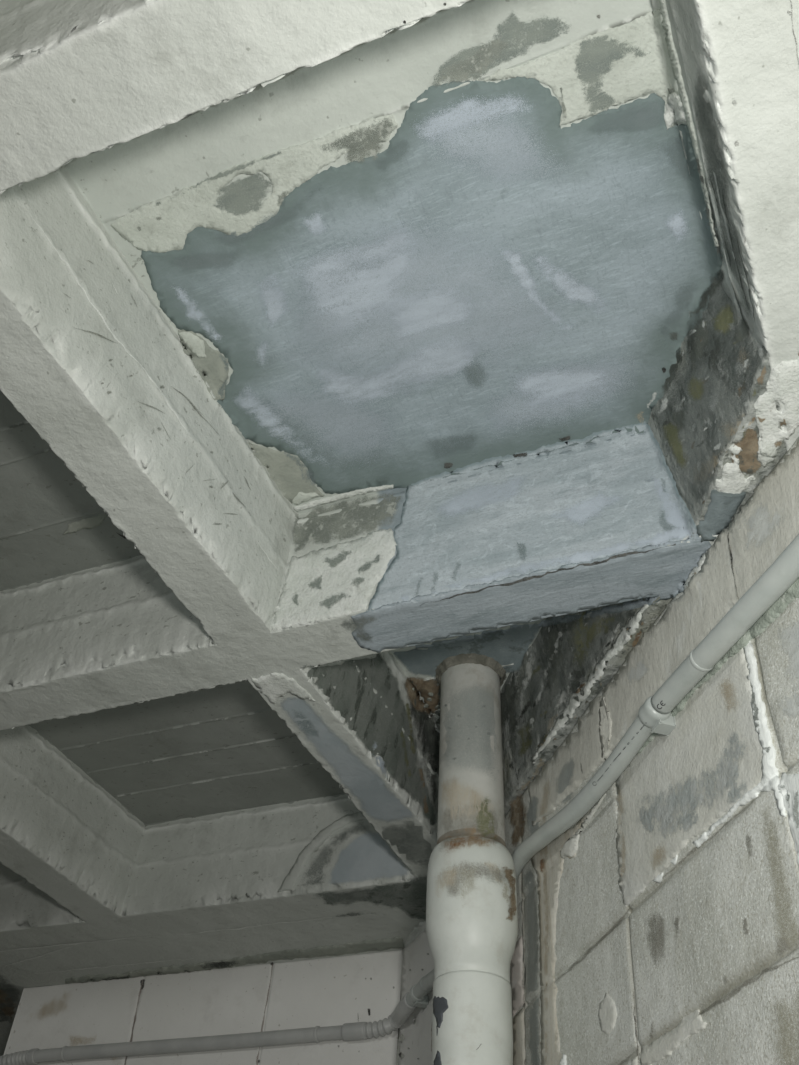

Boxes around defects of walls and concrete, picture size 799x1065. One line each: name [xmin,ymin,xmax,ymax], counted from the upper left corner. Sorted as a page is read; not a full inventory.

peeling [178,330,230,400]
peeling [111,114,398,253]
peeling [432,0,720,257]
damp [638,66,766,512]
peeling [521,354,799,834]
damp [292,604,639,921]
damp [643,911,679,965]
peeling [531,640,799,1065]